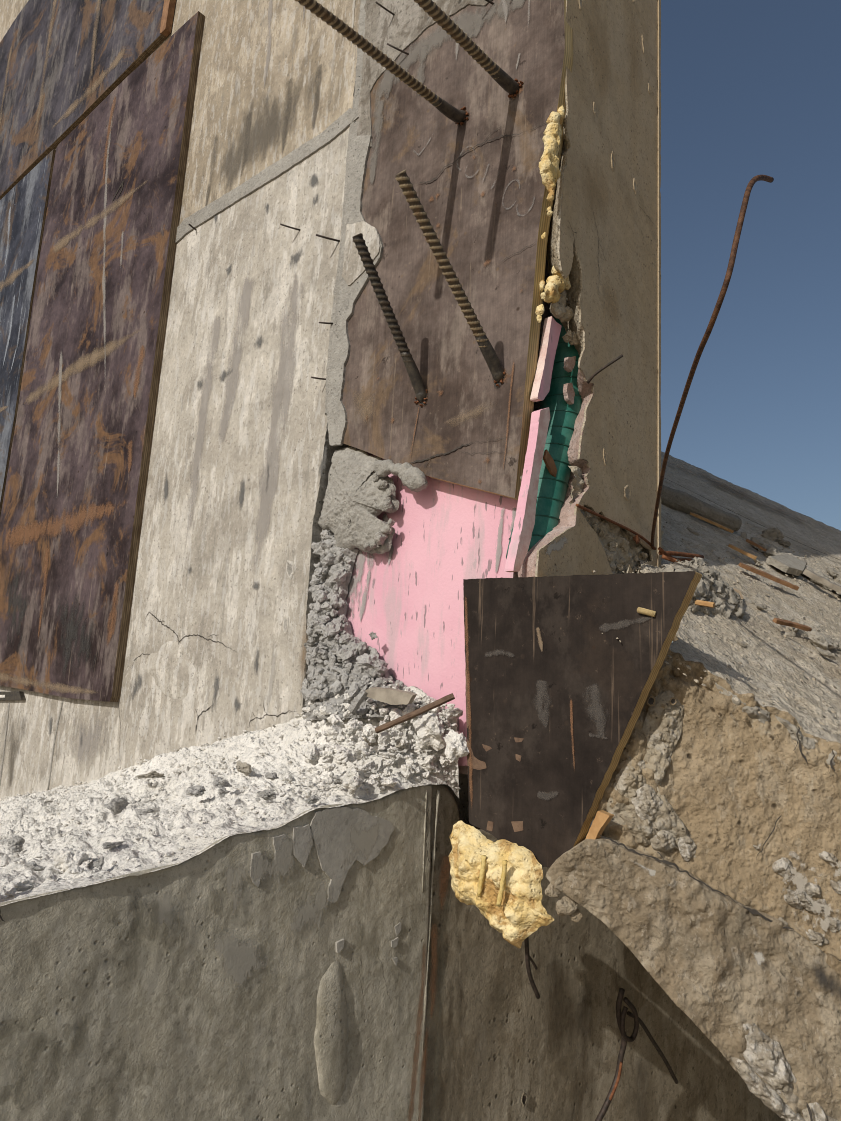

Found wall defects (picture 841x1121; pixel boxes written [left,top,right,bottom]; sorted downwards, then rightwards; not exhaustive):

rust [28,337,128,402]
peeling [318,135,399,554]
crack [144,612,229,648]
crack [600,835,794,930]
spalling [772,851,841,948]
spalling [730,1023,838,1121]